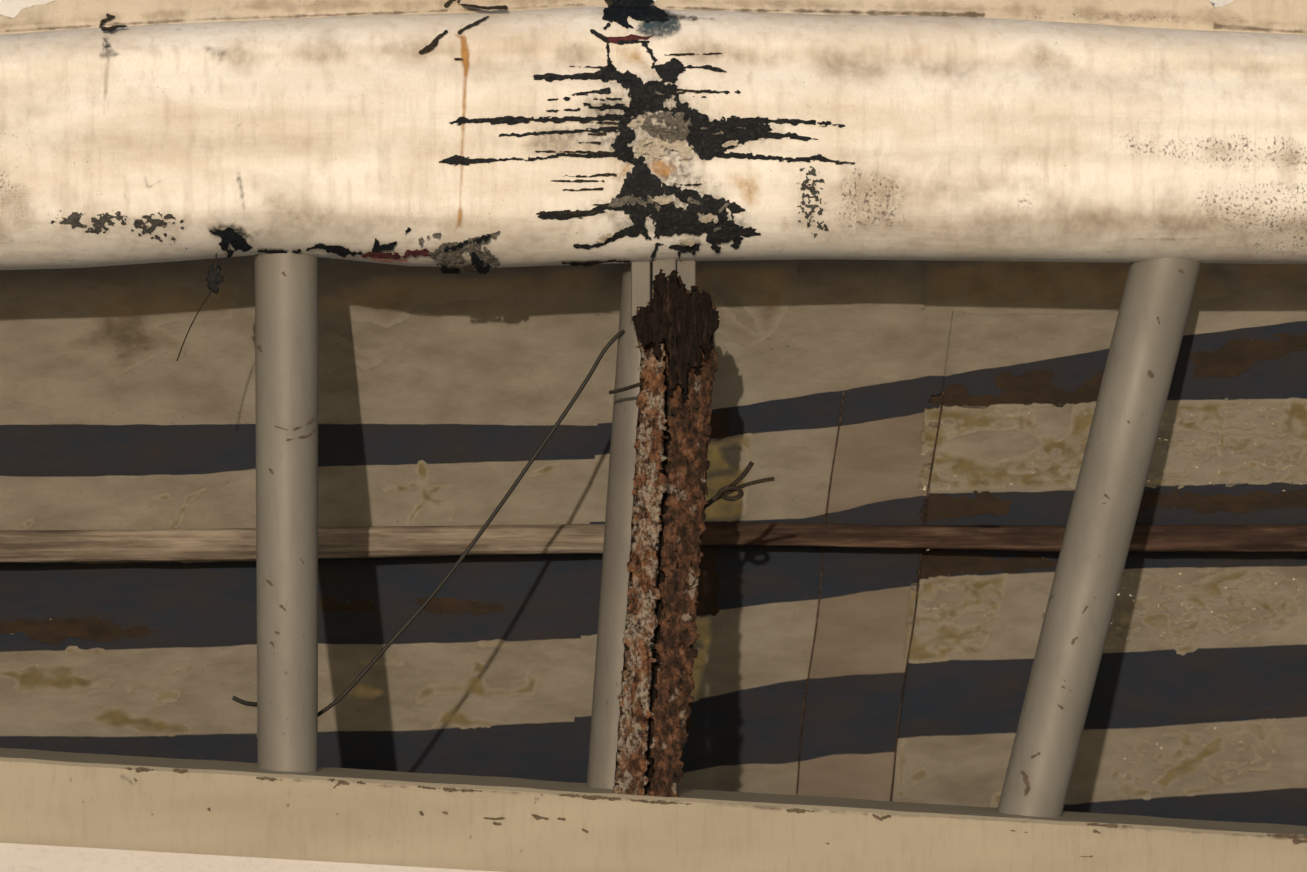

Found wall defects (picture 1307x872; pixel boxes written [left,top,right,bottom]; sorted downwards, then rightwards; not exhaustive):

peeling [590,0,669,45]
rust [460,36,469,130]
peeling [56,283,240,373]
peeling [1188,333,1307,379]
peeling [918,369,1104,523]
peeling [1139,398,1307,514]
peeling [904,550,1057,664]
peeling [1136,568,1251,656]
peeling [0,617,192,736]
peeling [896,738,934,799]
peeling [1115,736,1226,800]